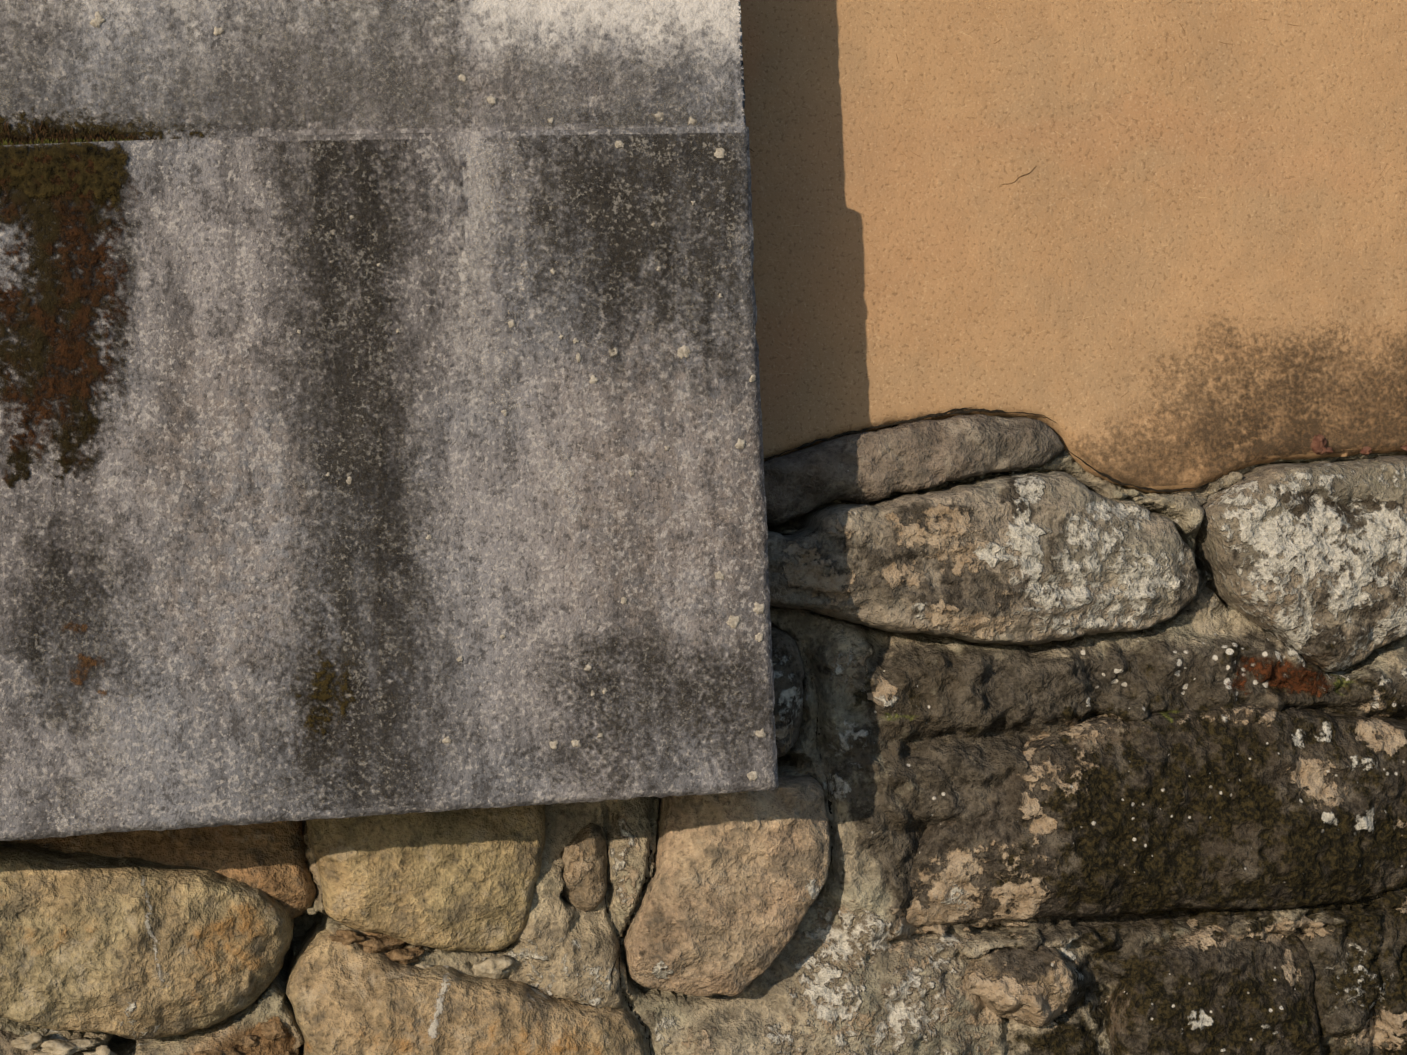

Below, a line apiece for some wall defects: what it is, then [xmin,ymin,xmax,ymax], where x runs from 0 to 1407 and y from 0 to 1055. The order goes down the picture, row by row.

corrosion [0,142,139,488]
water stain [93,0,466,811]
water stain [452,63,753,409]
water stain [4,516,149,734]
water stain [534,620,775,793]